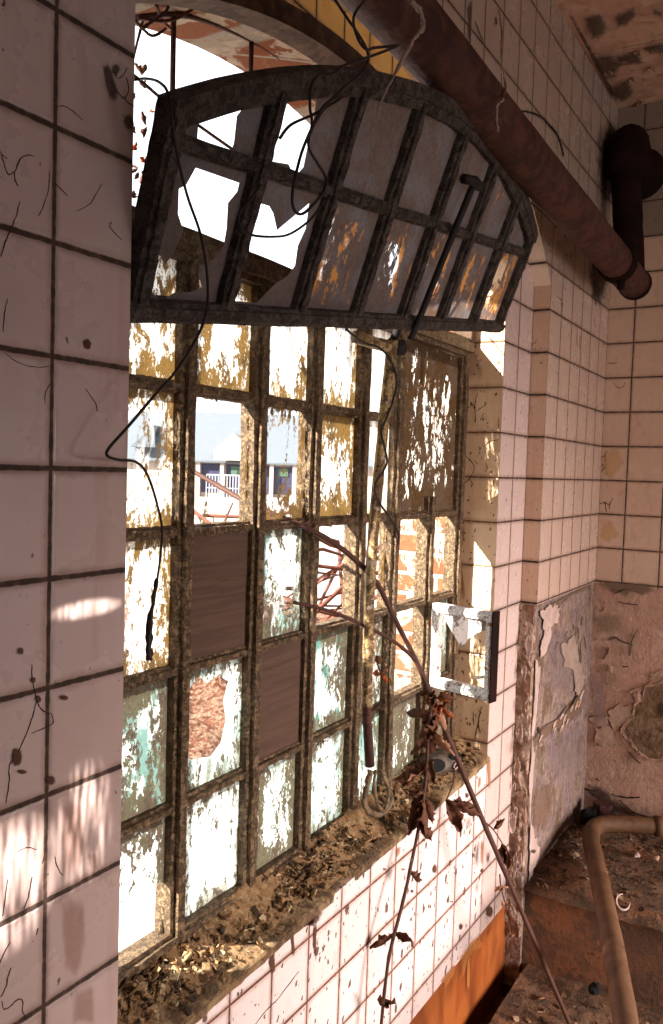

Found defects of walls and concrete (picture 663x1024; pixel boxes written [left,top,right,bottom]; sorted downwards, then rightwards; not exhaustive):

damp [570,11,663,101]
damp [598,128,618,198]
spalling [505,604,663,938]
peeling [442,937,480,987]